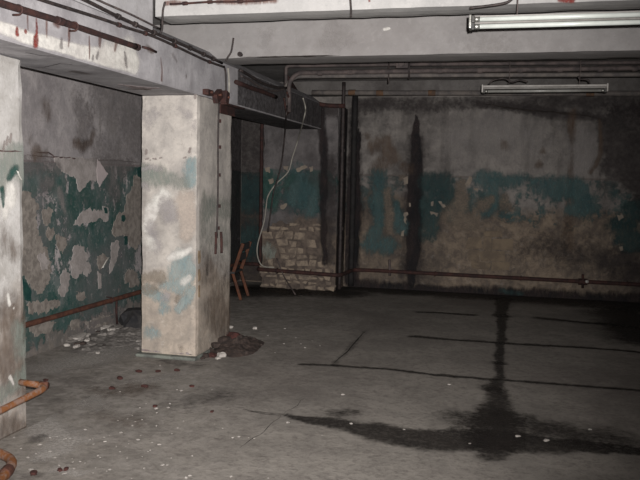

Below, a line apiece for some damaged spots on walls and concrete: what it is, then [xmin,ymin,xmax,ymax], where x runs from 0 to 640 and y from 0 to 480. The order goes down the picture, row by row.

peeling [0,133,201,404]
spalling [259,165,336,292]
peeling [362,170,411,254]
water stain [230,70,640,460]
peeling [420,172,457,243]
peeling [530,176,595,217]